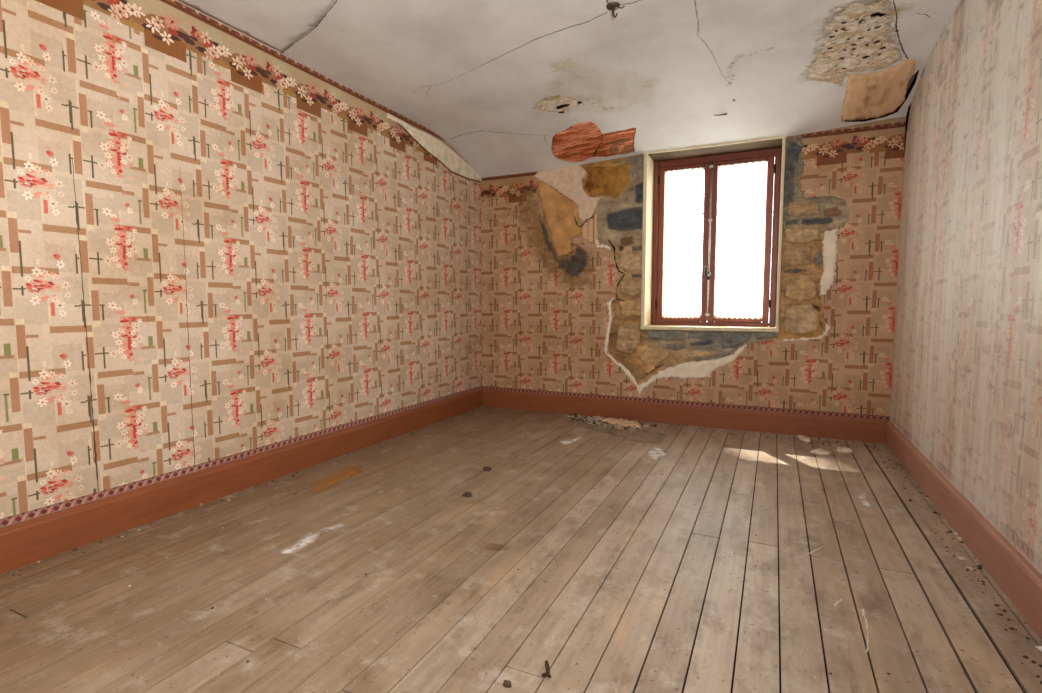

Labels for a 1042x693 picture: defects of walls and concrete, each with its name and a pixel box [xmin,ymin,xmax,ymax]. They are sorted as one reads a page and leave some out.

crack [280,0,337,54]
crack [694,0,730,84]
spalling [803,0,902,84]
crack [893,0,932,59]
spalling [533,95,583,113]
water stain [522,193,590,286]
flaking render [534,122,849,384]